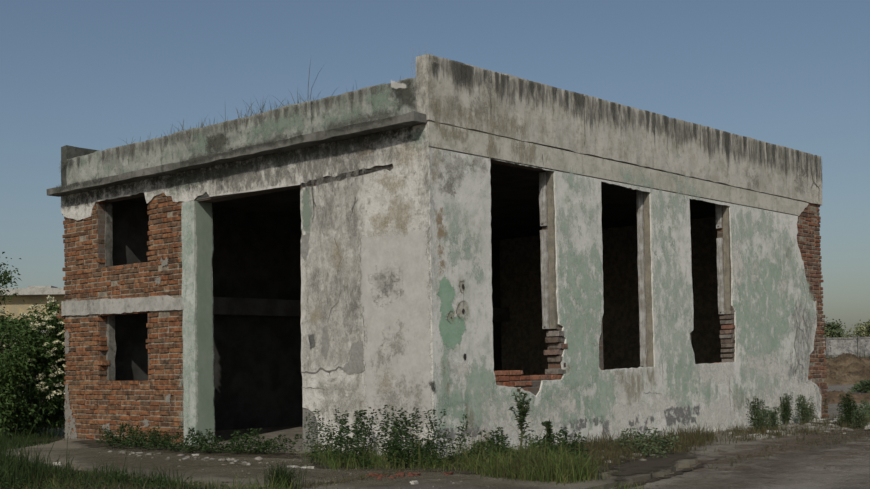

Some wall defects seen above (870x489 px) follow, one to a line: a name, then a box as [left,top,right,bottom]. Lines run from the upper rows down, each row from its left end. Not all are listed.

water stain [56,84,424,208]
crack [302,167,392,222]
water stain [429,56,822,192]
crack [301,306,366,390]
peeling [429,205,616,451]
peeling [714,211,817,406]